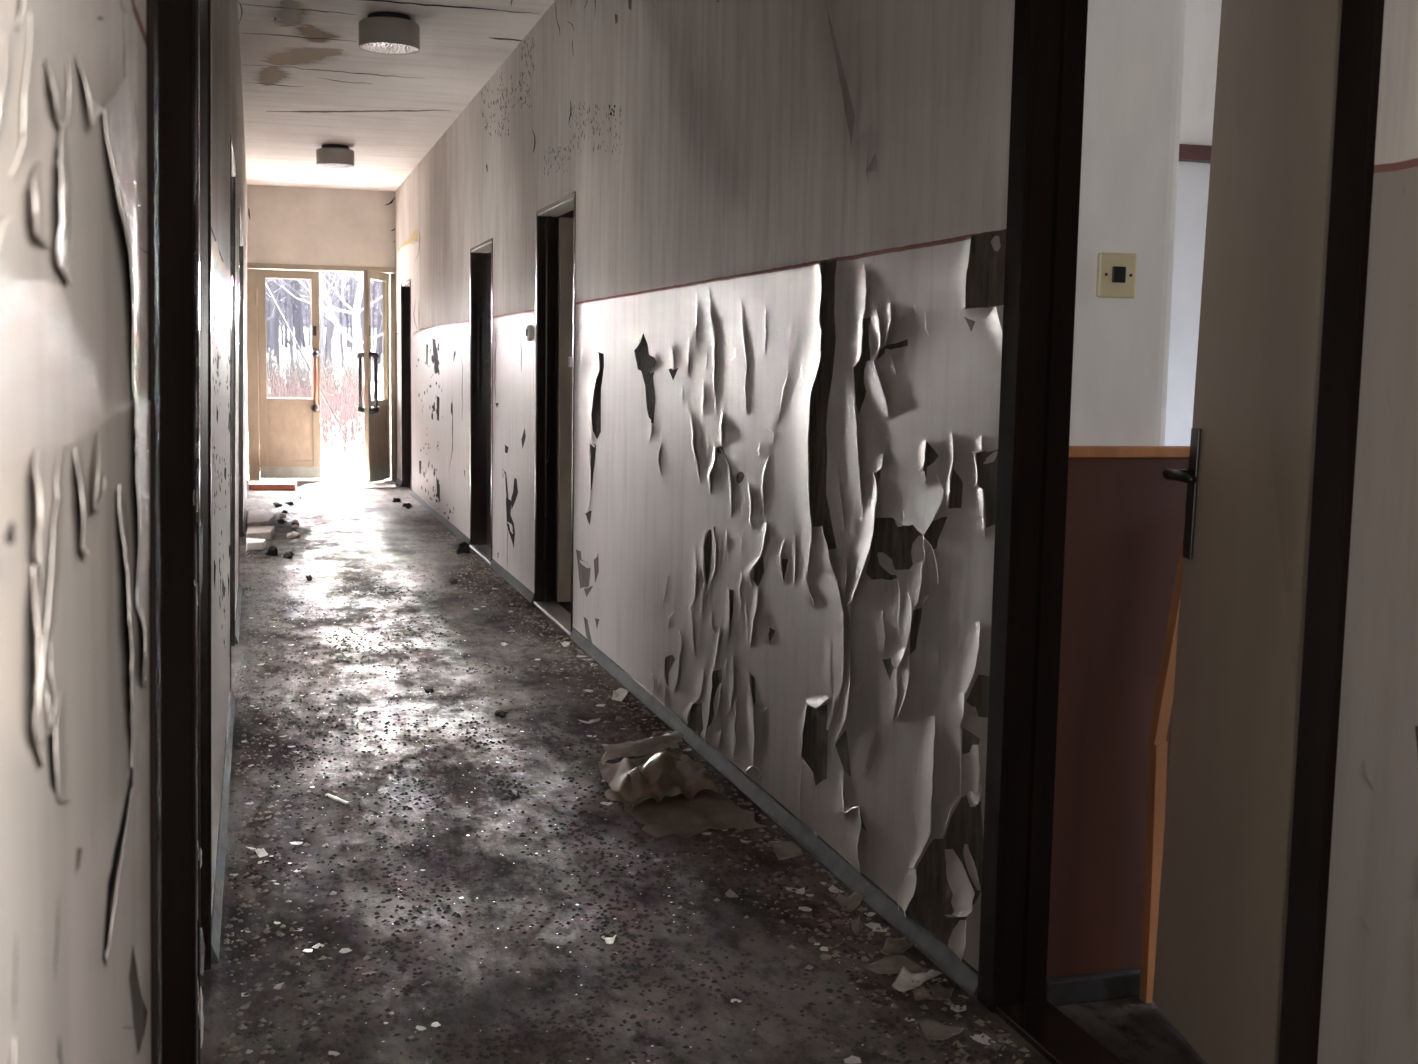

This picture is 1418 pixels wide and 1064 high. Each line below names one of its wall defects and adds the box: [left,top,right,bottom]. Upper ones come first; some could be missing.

peeling [0,0,150,1055]
peeling [193,442,230,644]
peeling [212,317,230,433]
peeling [211,235,234,297]
peeling [416,338,465,519]
peeling [502,428,526,547]
peeling [576,549,599,643]
peeling [584,352,604,525]
peeling [631,259,998,873]
peeling [953,229,1006,356]
peeling [897,622,989,960]
peeling [197,928,205,1048]